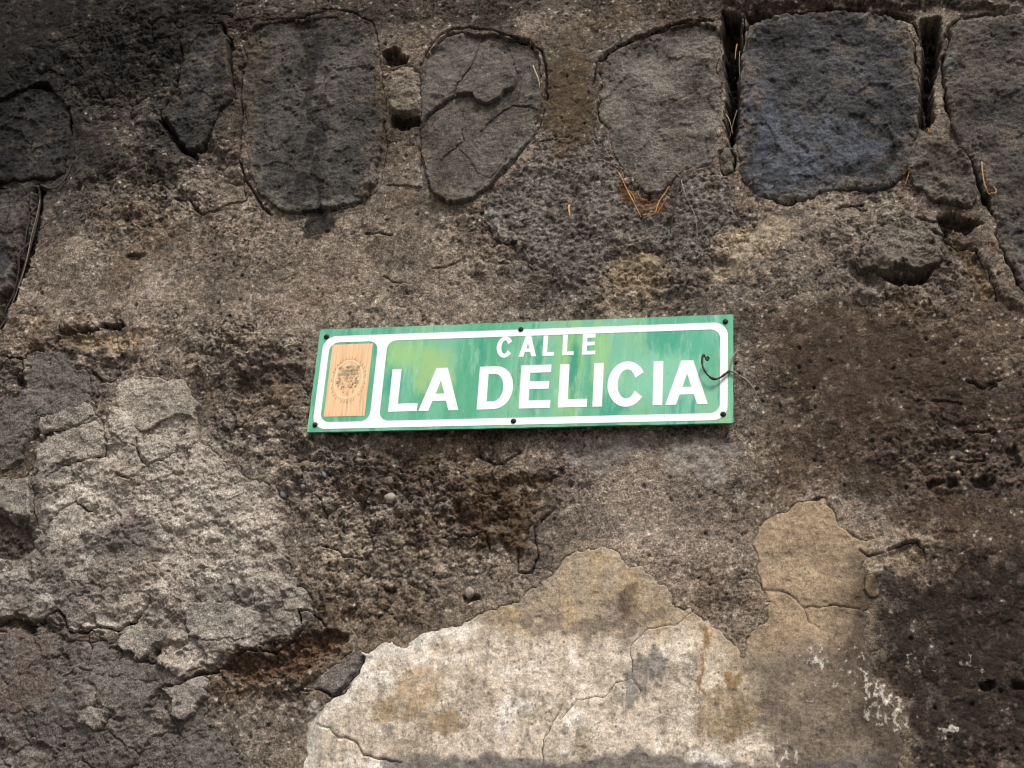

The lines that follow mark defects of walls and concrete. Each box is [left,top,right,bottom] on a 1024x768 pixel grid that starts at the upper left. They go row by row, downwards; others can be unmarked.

crack [331,10,494,212]
crack [497,32,549,175]
flaking render [0,375,315,768]
flaking render [301,498,903,768]
crack [542,613,690,767]
efflorescence [743,739,798,768]
efflorescence [799,643,828,670]
damp [838,552,1024,768]